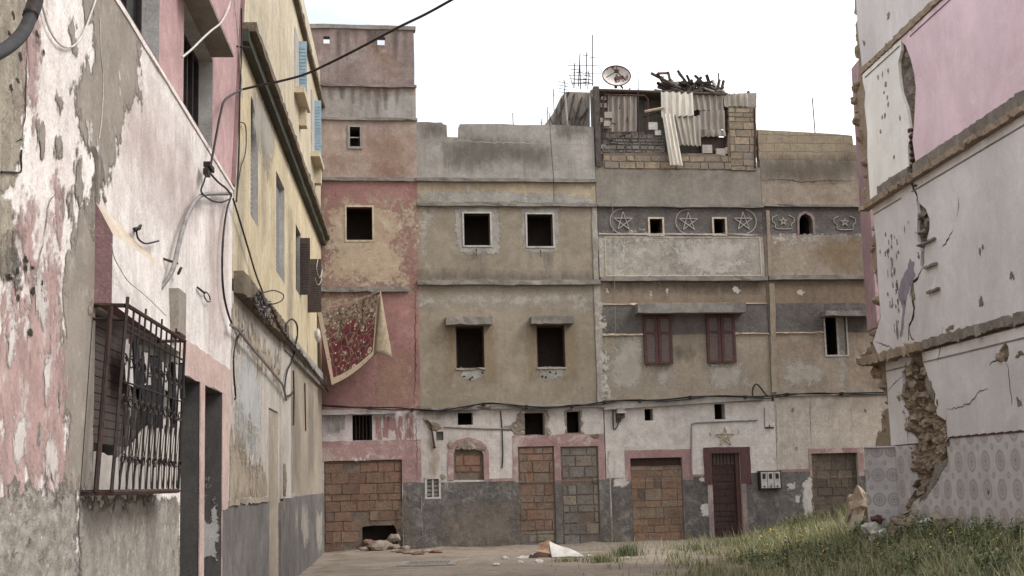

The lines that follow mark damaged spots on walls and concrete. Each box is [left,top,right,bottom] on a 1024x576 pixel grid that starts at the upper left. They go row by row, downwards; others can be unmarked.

spalling [850,80,868,194]
spalling [899,51,916,173]
peeling [0,0,180,576]
spalling [860,320,950,512]
crack [949,360,1012,410]
peeling [204,504,220,561]